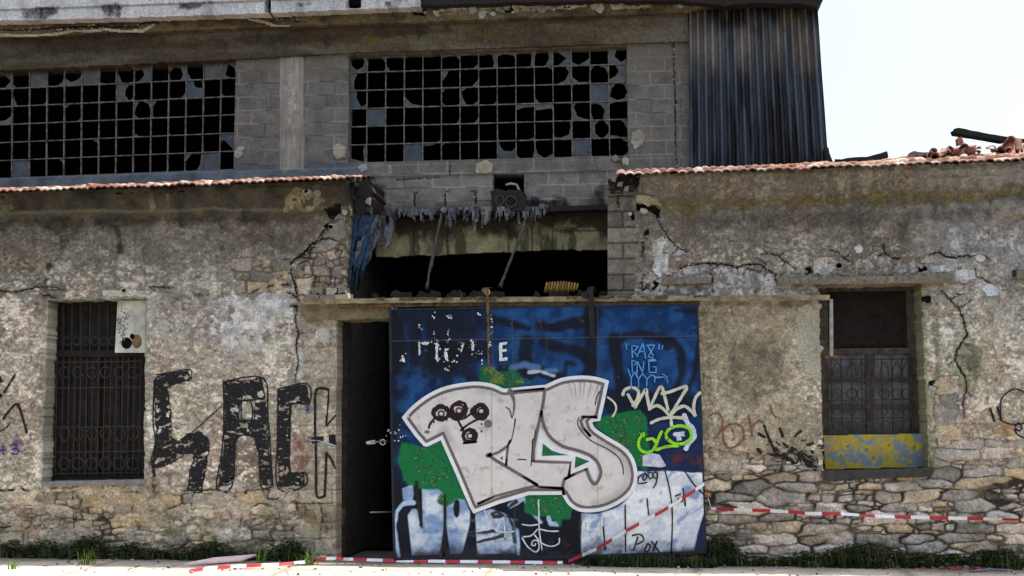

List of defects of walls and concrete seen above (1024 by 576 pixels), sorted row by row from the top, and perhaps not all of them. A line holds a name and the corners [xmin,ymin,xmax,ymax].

spalling [179,189,348,355]
crack [248,213,338,380]
spalling [628,203,660,221]
crack [640,213,796,291]
crack [929,245,991,419]